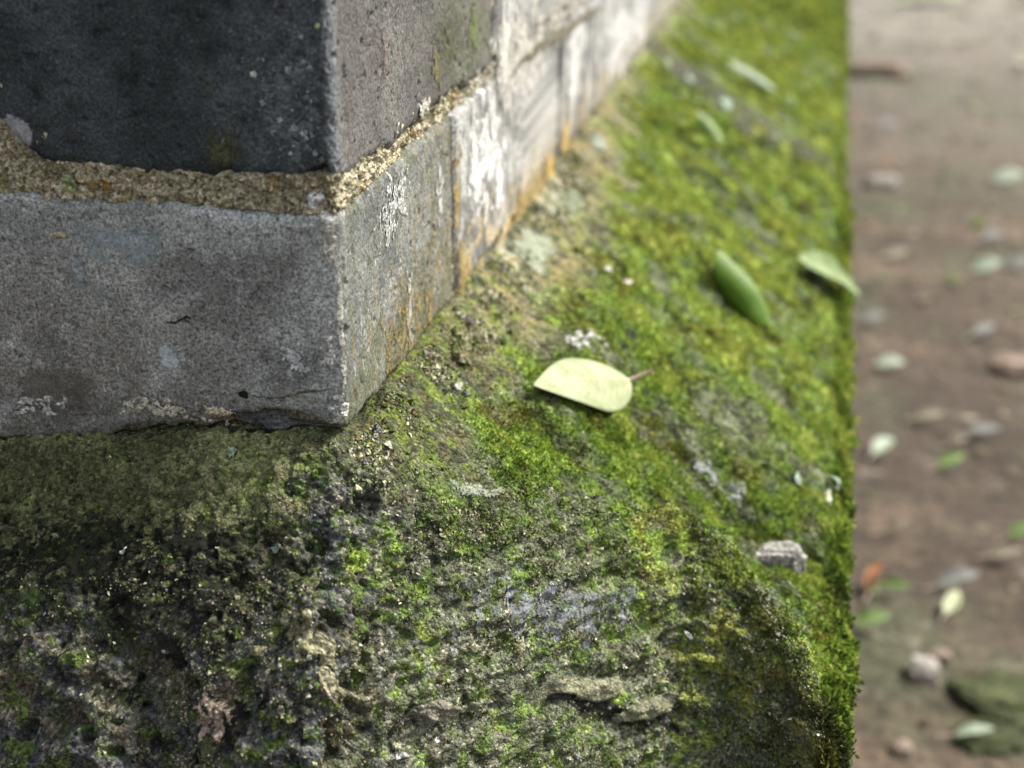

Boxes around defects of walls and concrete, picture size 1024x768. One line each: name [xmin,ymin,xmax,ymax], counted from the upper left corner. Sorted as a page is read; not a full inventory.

leakage [373,158,415,250]
leakage [436,150,444,228]
leakage [406,270,415,350]